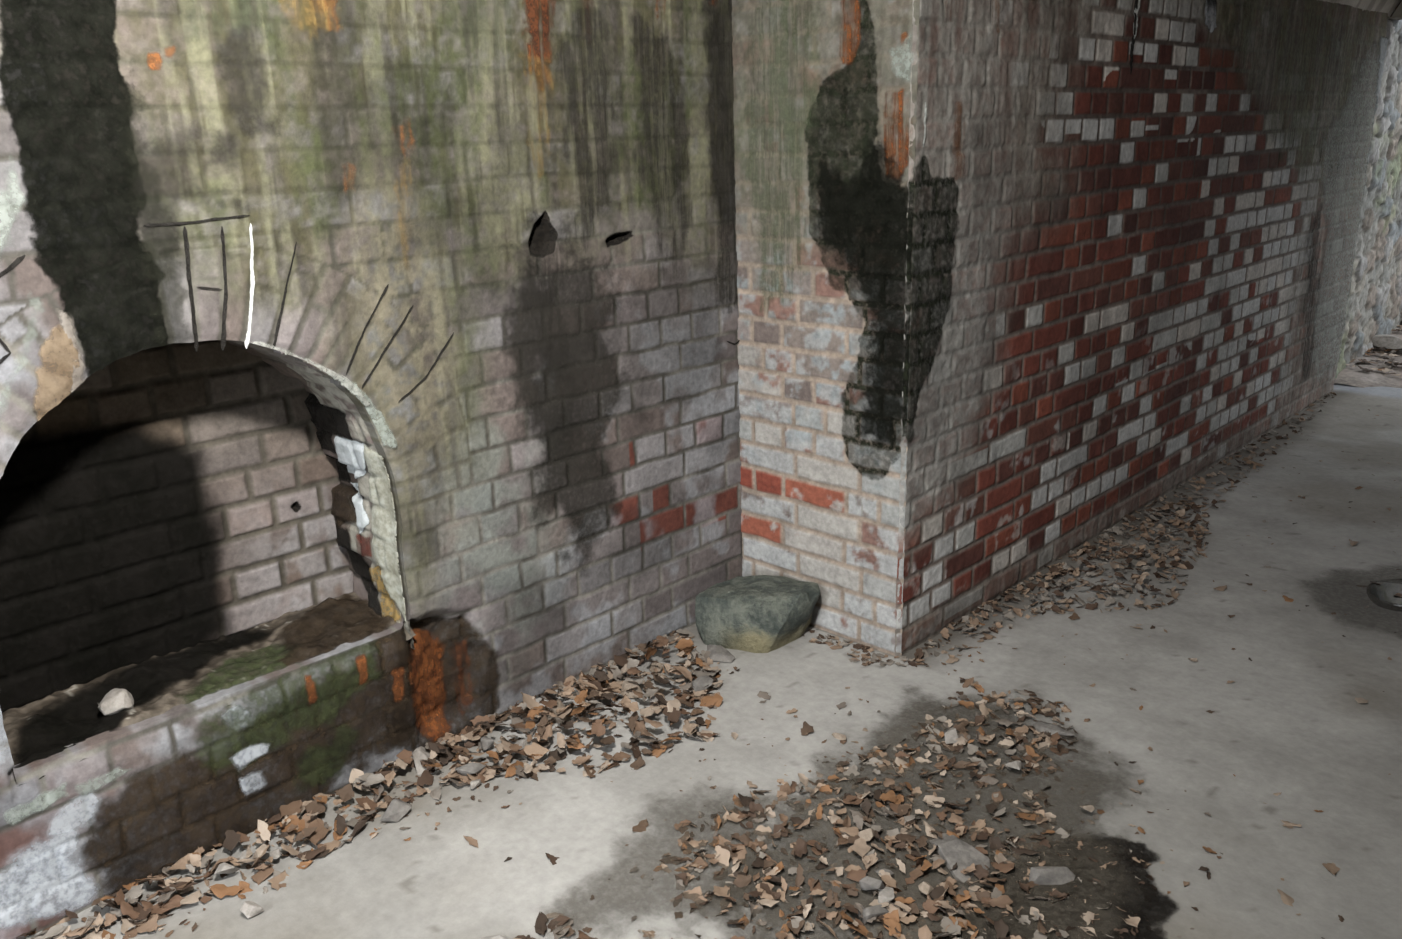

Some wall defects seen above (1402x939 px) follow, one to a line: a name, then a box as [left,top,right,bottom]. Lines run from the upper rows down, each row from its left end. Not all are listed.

corrosion [525,0,555,91]
corrosion [841,0,860,64]
corrosion [884,33,927,179]
crack [1130,0,1138,75]
damp [0,0,178,377]
flaking render [253,342,407,627]
corrosion [305,676,317,704]
corrosion [356,655,368,685]
corrosion [391,616,499,750]
damp [0,633,413,927]